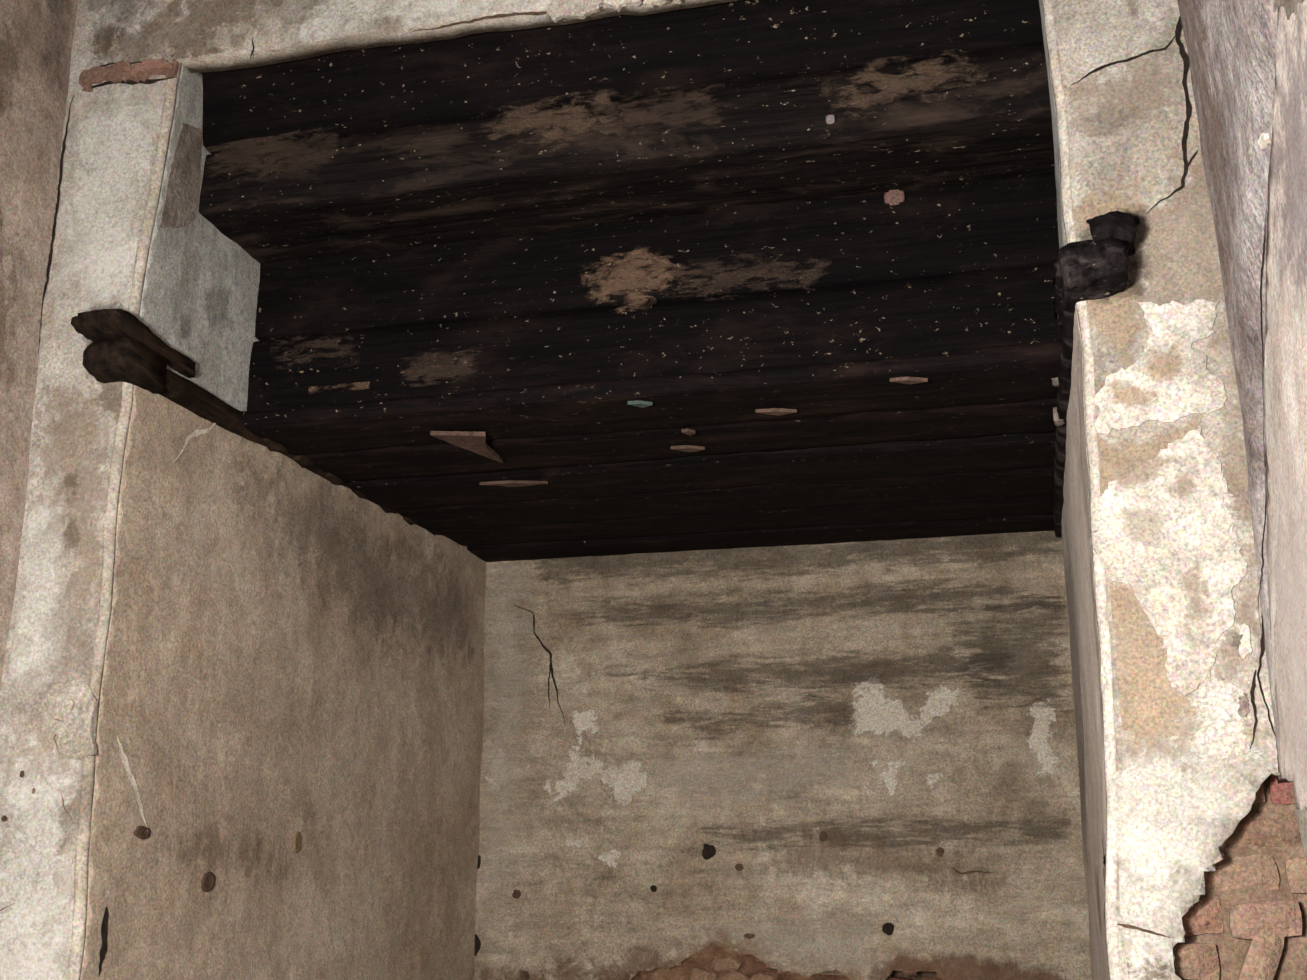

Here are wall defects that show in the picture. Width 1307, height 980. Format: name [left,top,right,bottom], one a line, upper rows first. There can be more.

leakage [287,0,557,41]
crack [1070,16,1198,215]
crack [1249,174,1279,772]
crack [514,605,565,724]
peeling [1093,299,1307,980]
peeling [850,675,961,743]
peeling [543,706,656,807]
peeling [869,759,906,798]
peeling [564,831,621,869]
spalling [632,942,851,980]
spalling [886,968,942,980]